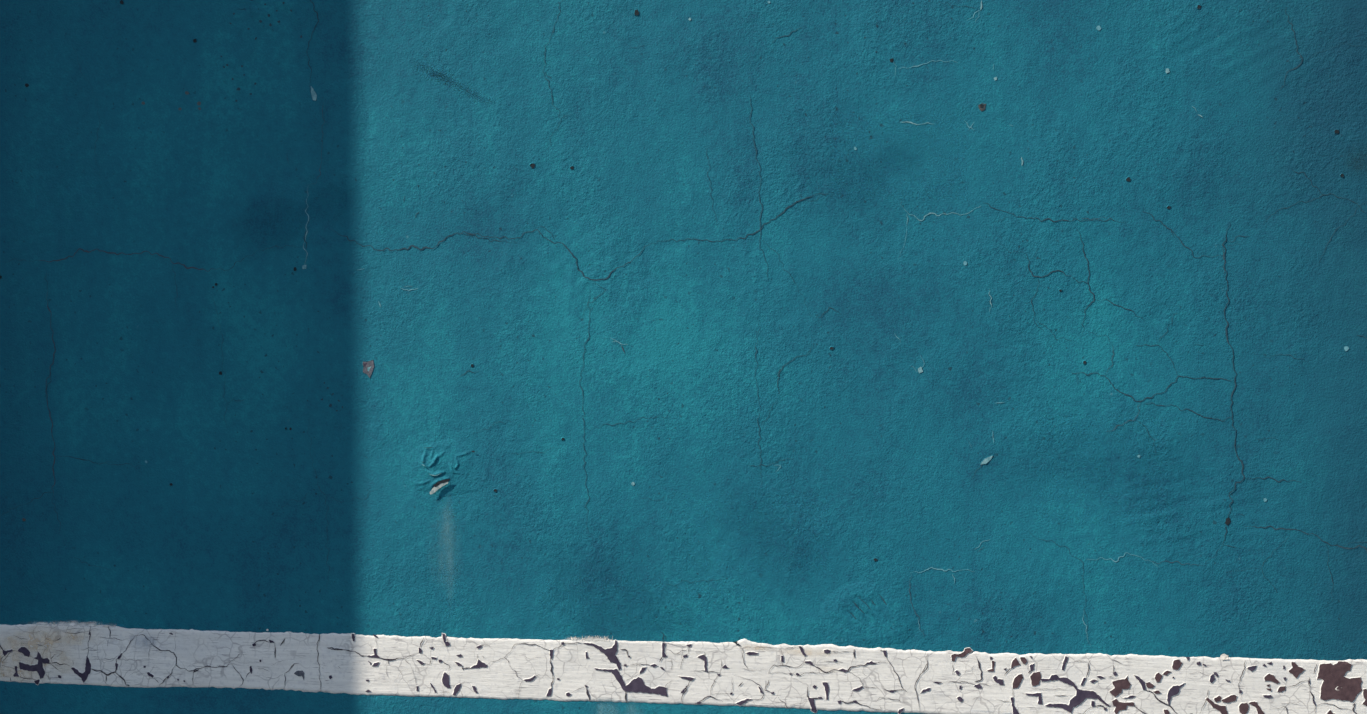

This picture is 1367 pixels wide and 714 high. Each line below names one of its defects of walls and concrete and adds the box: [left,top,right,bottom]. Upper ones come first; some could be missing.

crack [10,0,824,534]
crack [750,307,841,485]
crack [898,172,1367,646]
peeling [0,626,95,685]
peeling [328,633,513,696]
peeling [568,633,763,703]
peeling [778,681,830,713]
peeling [934,647,1367,714]